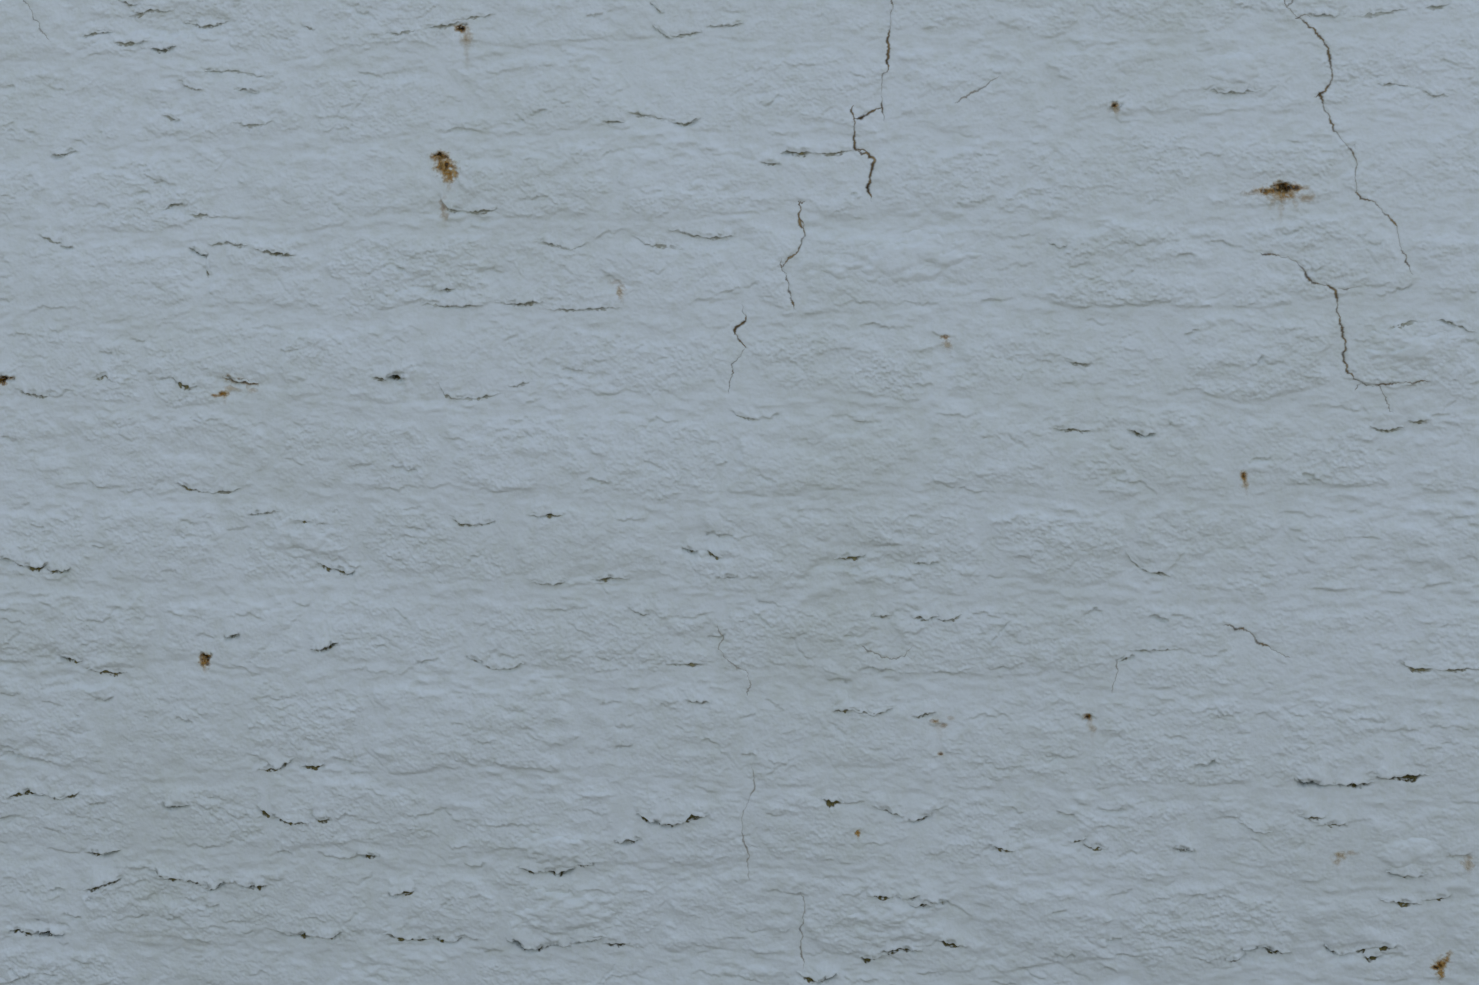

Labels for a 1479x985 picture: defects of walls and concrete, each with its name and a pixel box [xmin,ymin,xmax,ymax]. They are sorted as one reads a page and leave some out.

rust [433,152,458,181]
crack [850,0,892,197]
rust [1260,183,1300,198]
crack [1285,4,1409,265]
crack [781,201,805,307]
crack [728,317,746,392]
crack [1262,253,1429,390]